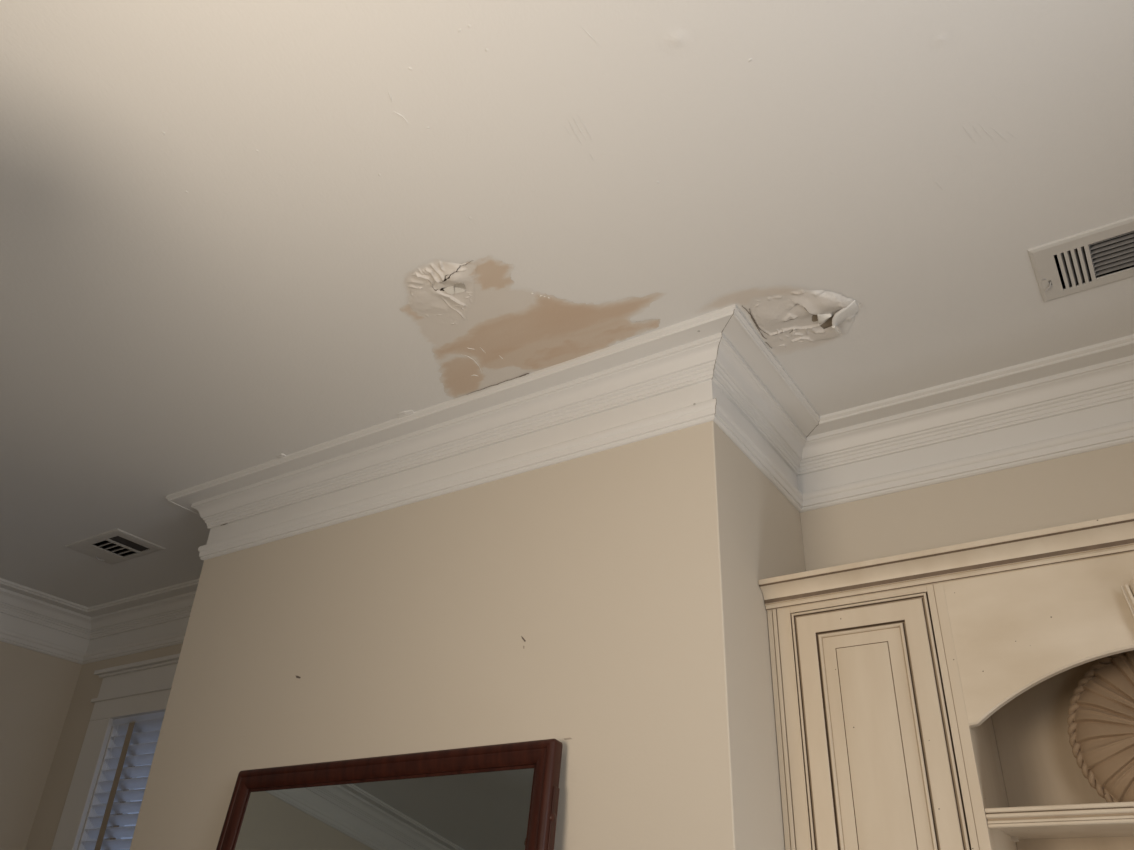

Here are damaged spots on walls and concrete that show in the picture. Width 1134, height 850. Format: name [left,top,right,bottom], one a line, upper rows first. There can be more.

peeling [405,260,478,327]
peeling [749,289,865,350]